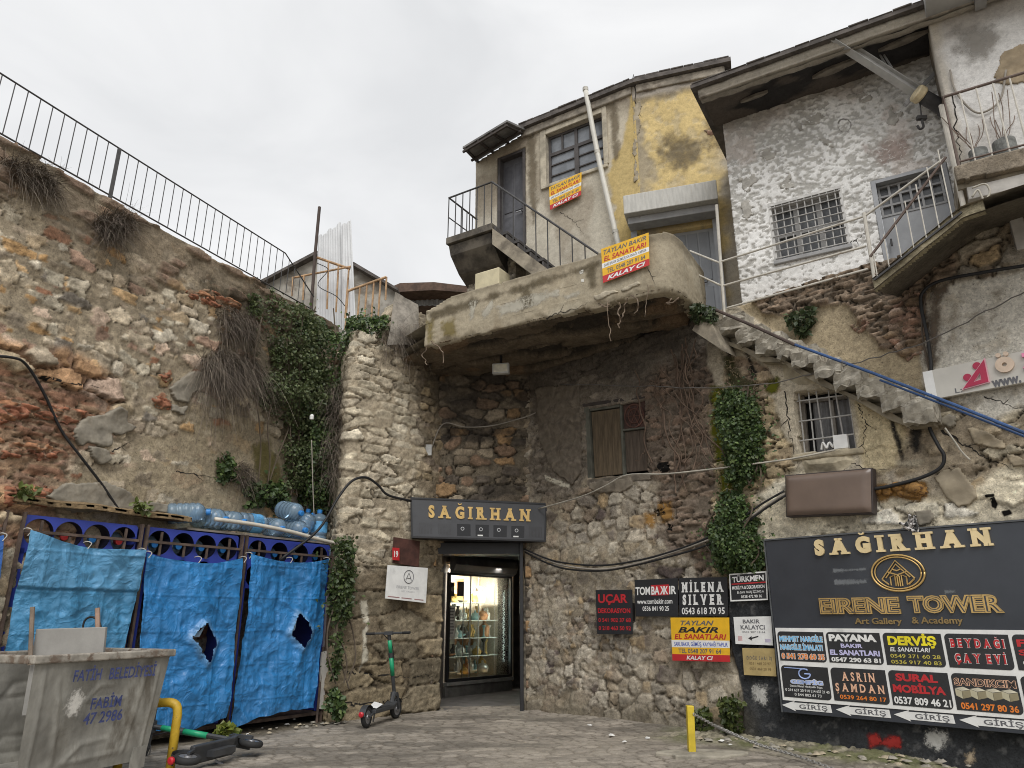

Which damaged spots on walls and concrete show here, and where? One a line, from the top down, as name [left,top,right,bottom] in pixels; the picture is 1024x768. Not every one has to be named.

peeling [994,44,1024,85]
leakage [658,128,719,169]
crack [952,96,962,165]
spalling [882,290,929,362]
crack [781,391,798,469]
peeling [967,427,1024,467]
peeling [934,468,1012,516]